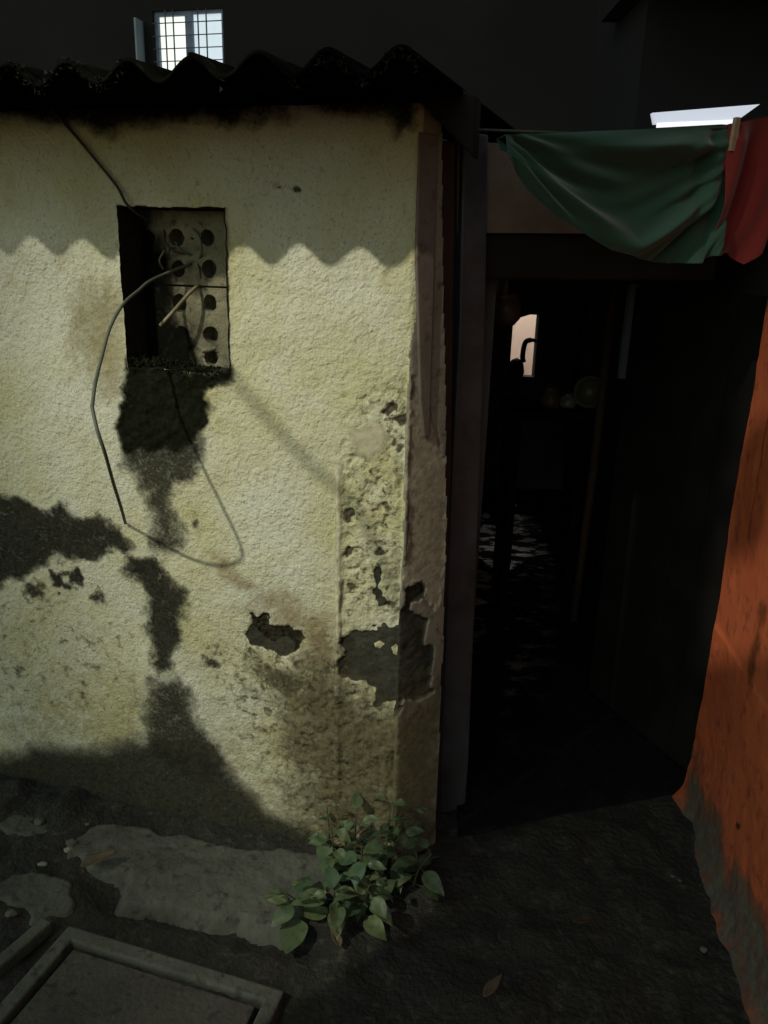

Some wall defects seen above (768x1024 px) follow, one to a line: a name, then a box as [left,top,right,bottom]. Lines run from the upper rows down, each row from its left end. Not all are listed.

spalling [244,612,305,656]
peeling [337,390,447,716]